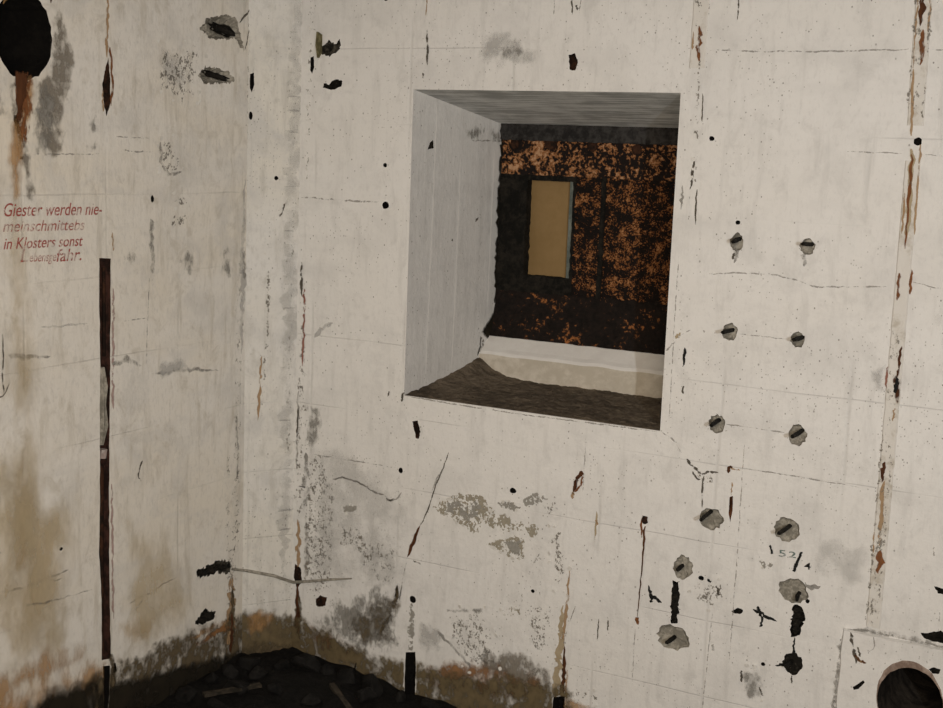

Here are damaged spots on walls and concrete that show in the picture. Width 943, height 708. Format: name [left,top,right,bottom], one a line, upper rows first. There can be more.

rust [11,71,33,197]
water stain [36,18,74,156]
rust [102,0,114,112]
spalling [200,14,252,52]
rust [901,145,922,245]
rust [907,0,932,136]
rust [896,271,913,299]
water stain [307,409,319,443]
crack [399,452,449,599]
peeling [433,493,572,594]
rust [865,435,893,623]
water stain [0,584,579,708]